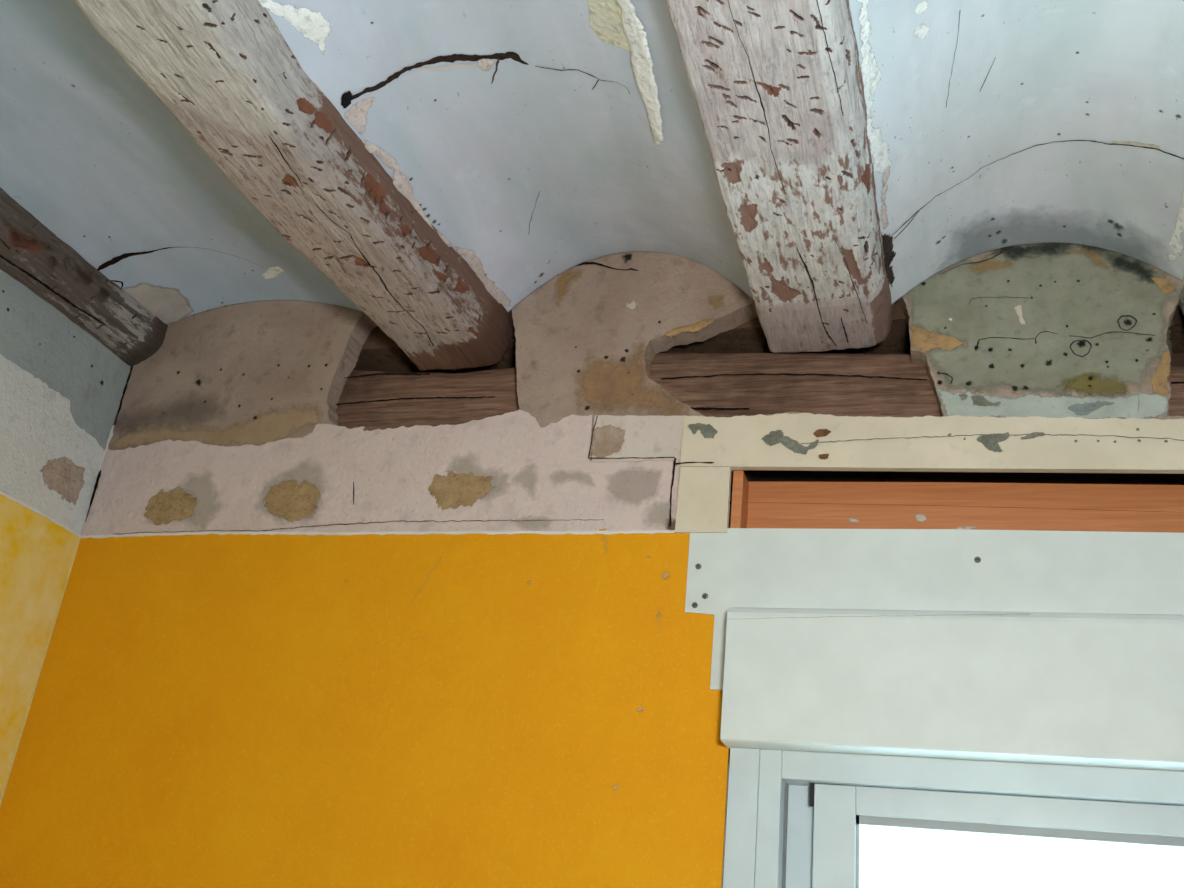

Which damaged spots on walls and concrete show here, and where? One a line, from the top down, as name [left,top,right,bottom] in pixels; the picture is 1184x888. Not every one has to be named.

crack [352,52,630,100]
crack [728,1,786,194]
crack [816,0,844,116]
crack [891,140,1184,239]
crack [97,247,260,288]
peeling [937,352,1171,442]
peeling [689,423,718,438]
peeling [761,429,831,459]
peeling [948,432,1045,452]
spalling [40,456,85,505]
spalling [144,487,197,525]
spalling [428,470,495,510]